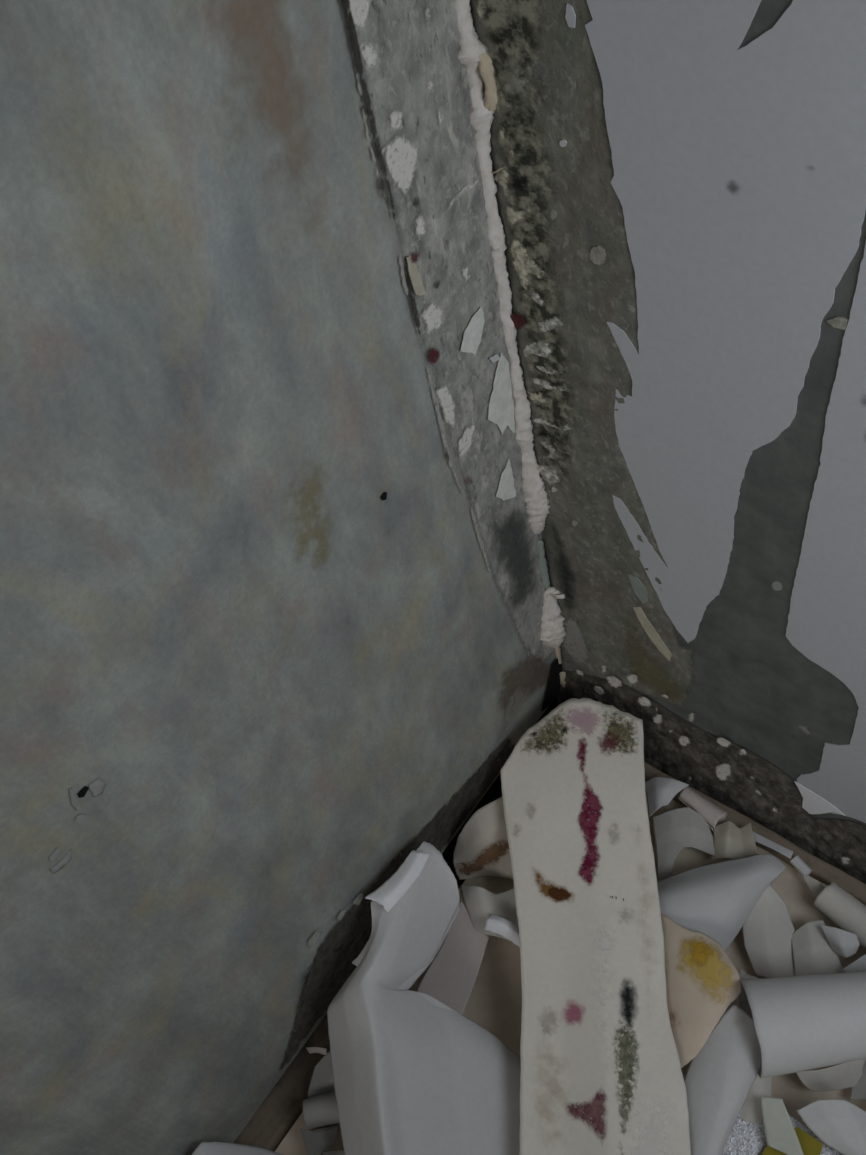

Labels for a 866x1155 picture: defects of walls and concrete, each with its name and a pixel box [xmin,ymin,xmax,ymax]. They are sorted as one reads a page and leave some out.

spalling [68,778,107,825]
damp [496,516,534,605]
damp [477,0,574,495]
peeling [348,0,866,884]